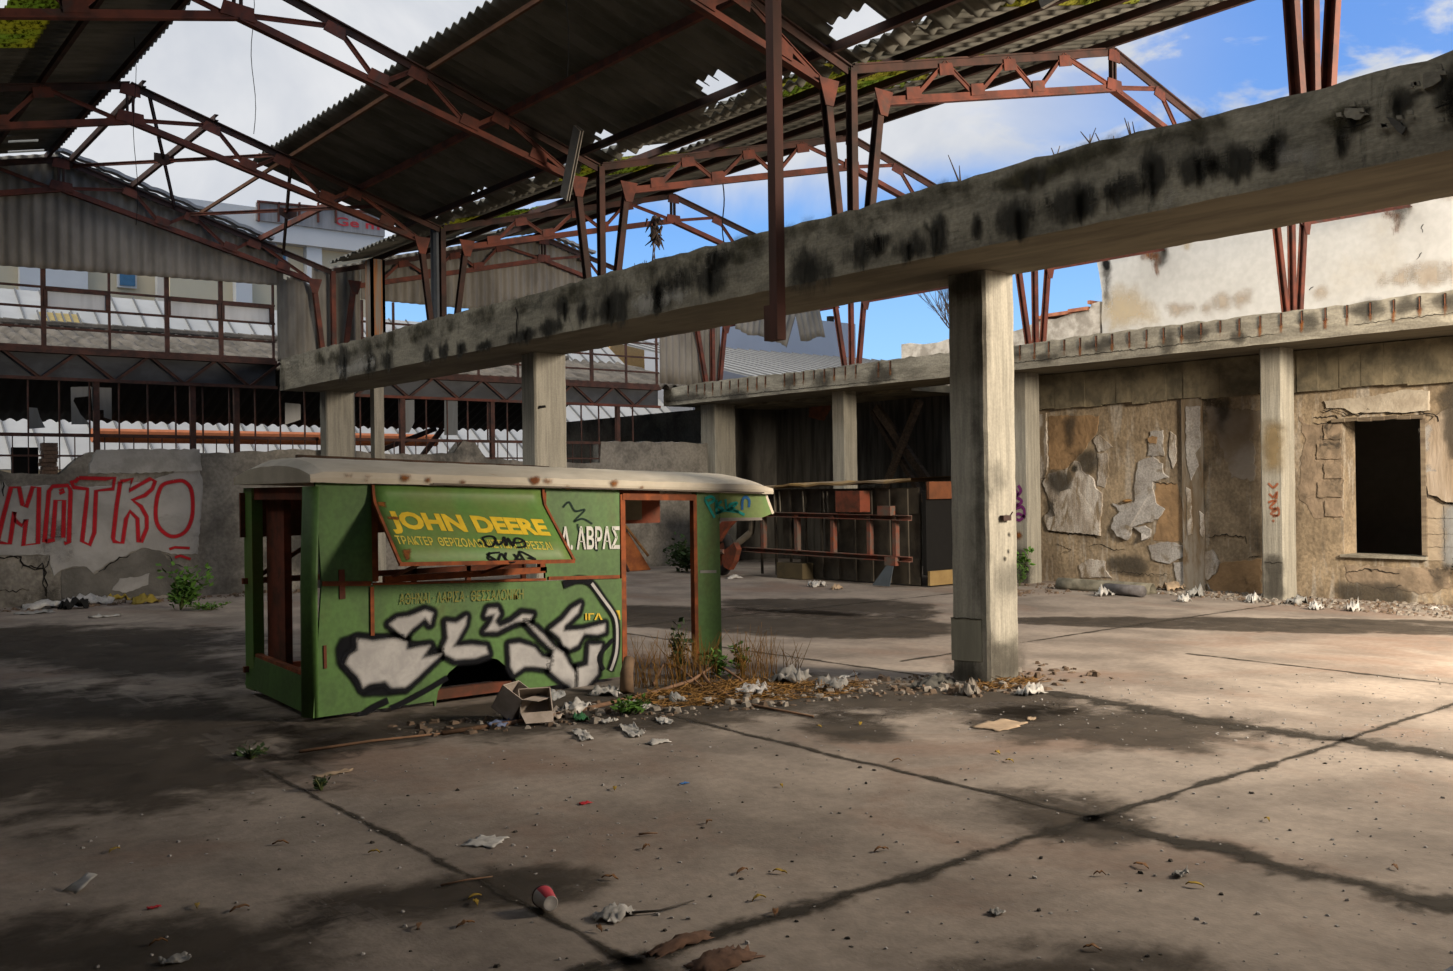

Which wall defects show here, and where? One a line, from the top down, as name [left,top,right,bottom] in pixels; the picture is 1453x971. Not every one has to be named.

damp [971,116,1313,241]
damp [1325,106,1368,156]
damp [1389,88,1412,118]
flaking render [1039,405,1263,594]